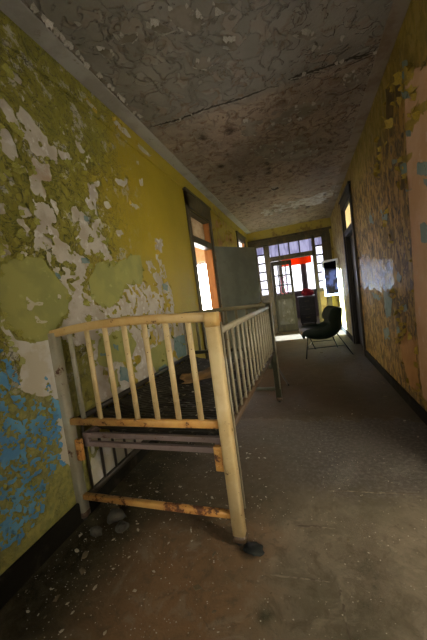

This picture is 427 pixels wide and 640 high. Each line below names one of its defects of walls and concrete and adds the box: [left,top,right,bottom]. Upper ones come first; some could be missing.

peeling [24,0,143,118]
peeling [0,92,188,551]
crack [152,51,377,127]
spalling [369,60,427,404]